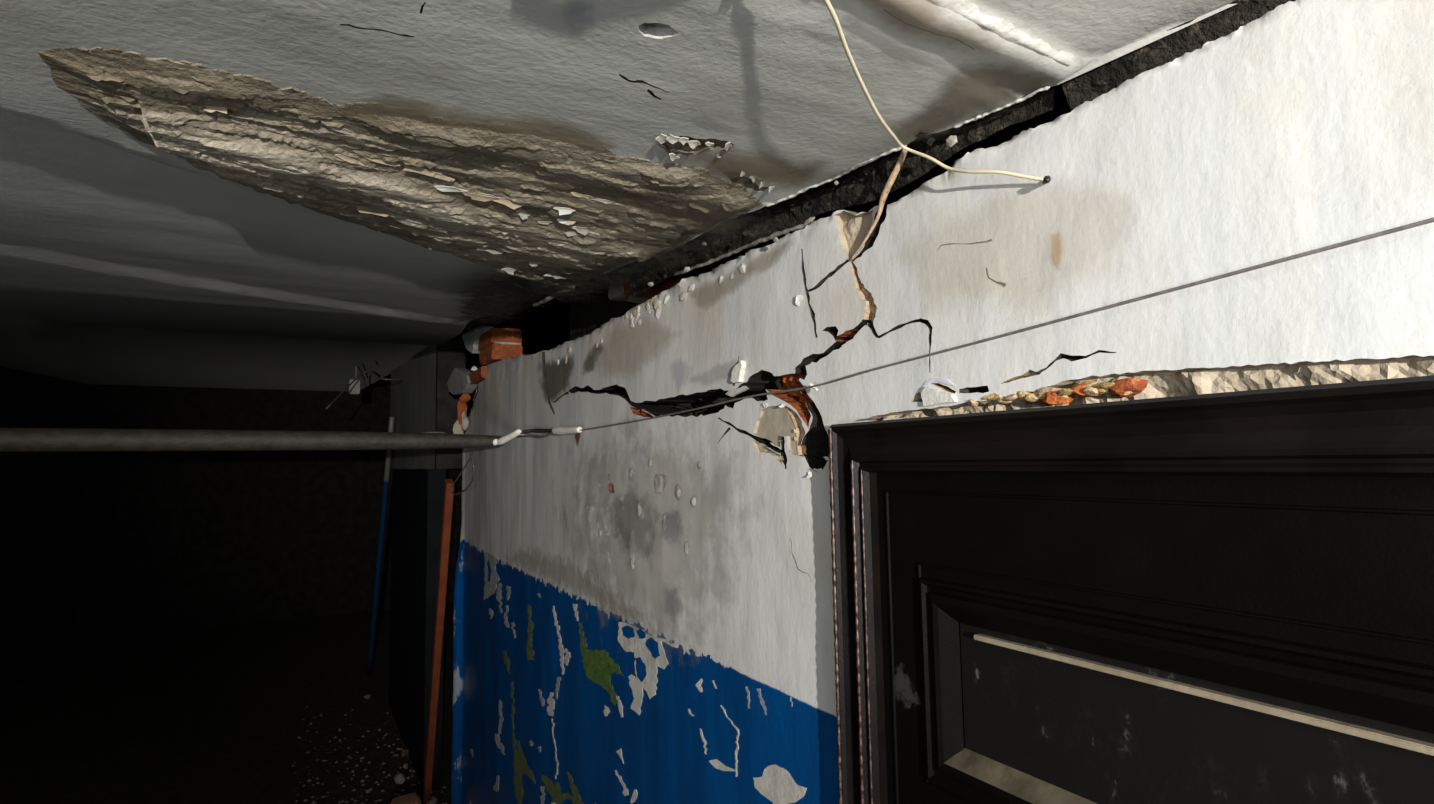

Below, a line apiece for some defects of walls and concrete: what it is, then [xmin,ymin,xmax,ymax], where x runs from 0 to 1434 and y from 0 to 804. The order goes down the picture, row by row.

crack [340,2,426,37]
crack [619,74,670,100]
peeling [38,46,775,287]
crack [938,239,1006,287]
spalling [624,283,695,328]
crack [542,249,932,478]
spalling [854,350,1434,422]
peeling [484,552,677,804]
peeling [688,679,807,804]